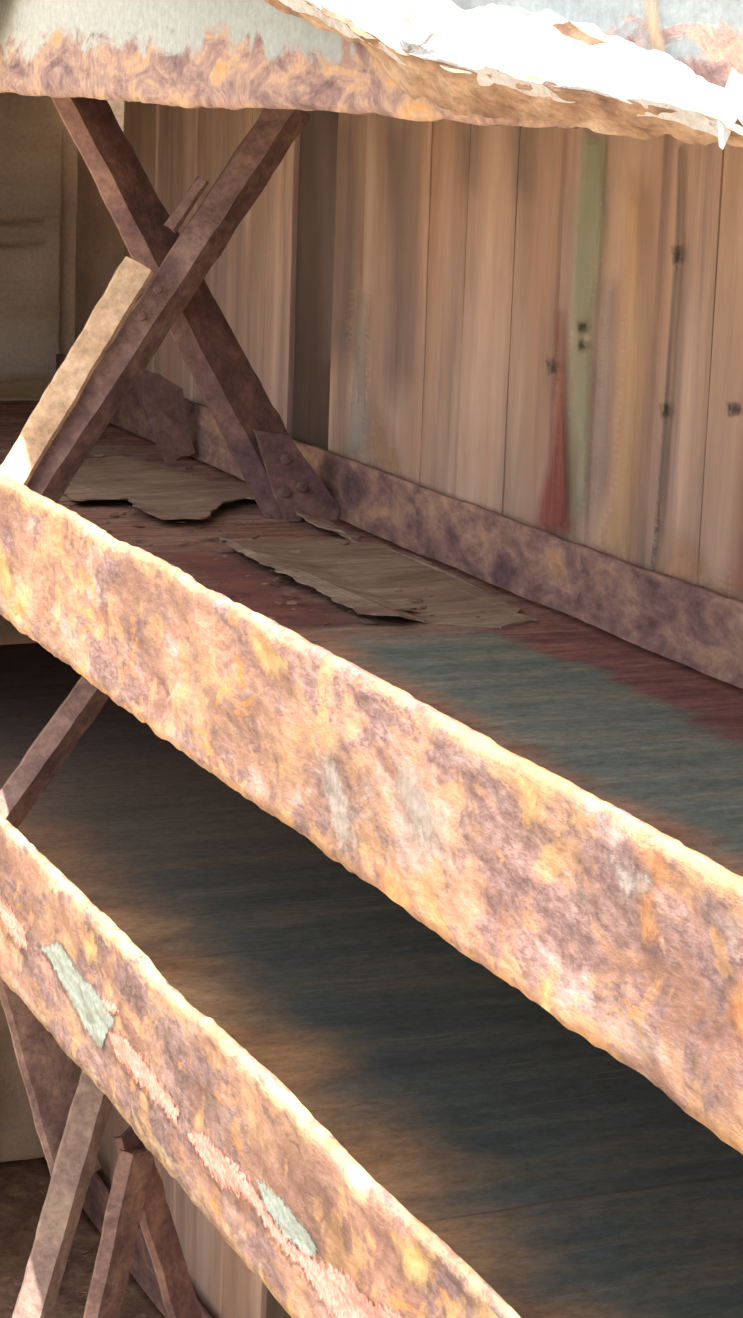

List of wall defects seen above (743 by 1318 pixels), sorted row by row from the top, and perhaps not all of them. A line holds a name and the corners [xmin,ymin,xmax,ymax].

peeling [400,9,438,46]
peeling [551,21,610,45]
rust [647,0,663,52]
rust [536,326,569,533]
rust [668,550,702,584]
rust [171,553,346,625]
rust [382,869,409,909]
rust [85,936,97,959]
rust [543,981,552,1012]
rust [733,989,743,1034]
rust [400,1245,428,1280]